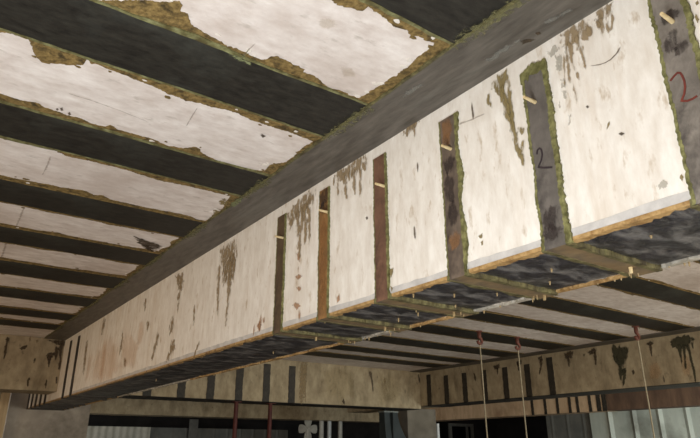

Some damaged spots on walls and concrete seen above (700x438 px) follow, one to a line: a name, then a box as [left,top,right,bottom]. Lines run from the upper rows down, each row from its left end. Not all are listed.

peeling [0,30,322,174]
peeling [100,0,450,103]
leakage [487,69,524,165]
leakage [549,4,614,108]
leakage [134,236,160,252]
leakage [217,241,237,326]
leakage [287,155,367,256]
leakage [46,340,65,383]
leakage [612,344,628,385]
leakage [670,335,696,382]